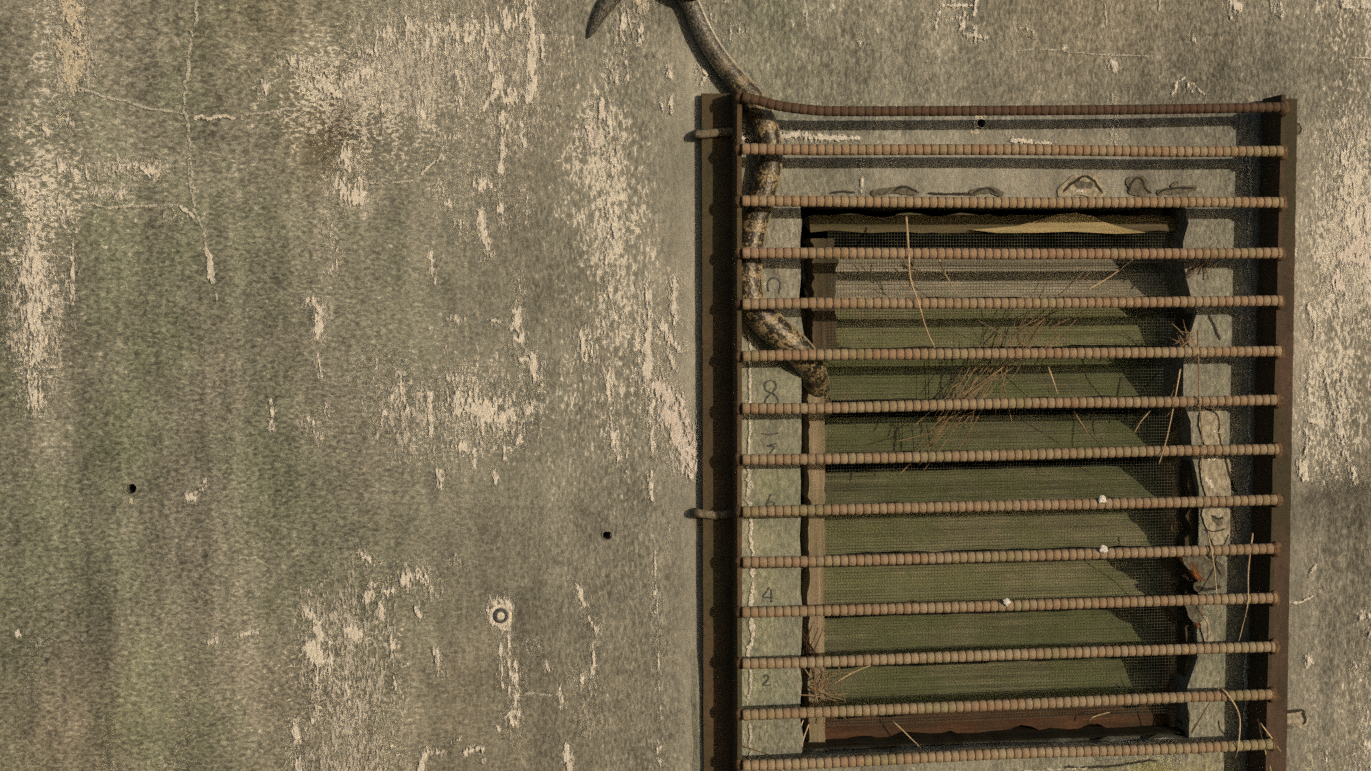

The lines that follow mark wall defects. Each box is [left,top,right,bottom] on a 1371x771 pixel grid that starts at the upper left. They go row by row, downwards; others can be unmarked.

crack [78,0,312,300]